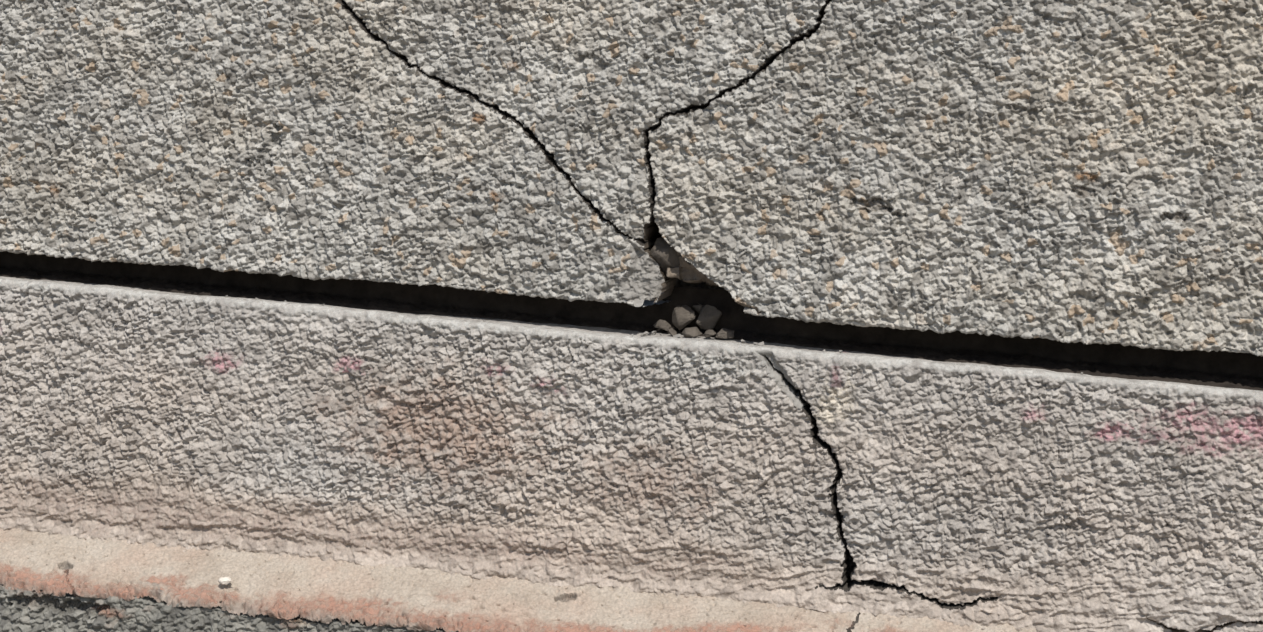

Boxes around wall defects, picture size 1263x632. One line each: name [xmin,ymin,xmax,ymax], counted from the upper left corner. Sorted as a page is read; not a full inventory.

crack [336,0,832,246]
spalling [619,222,761,315]
crack [753,349,998,632]
crack [1147,618,1263,632]